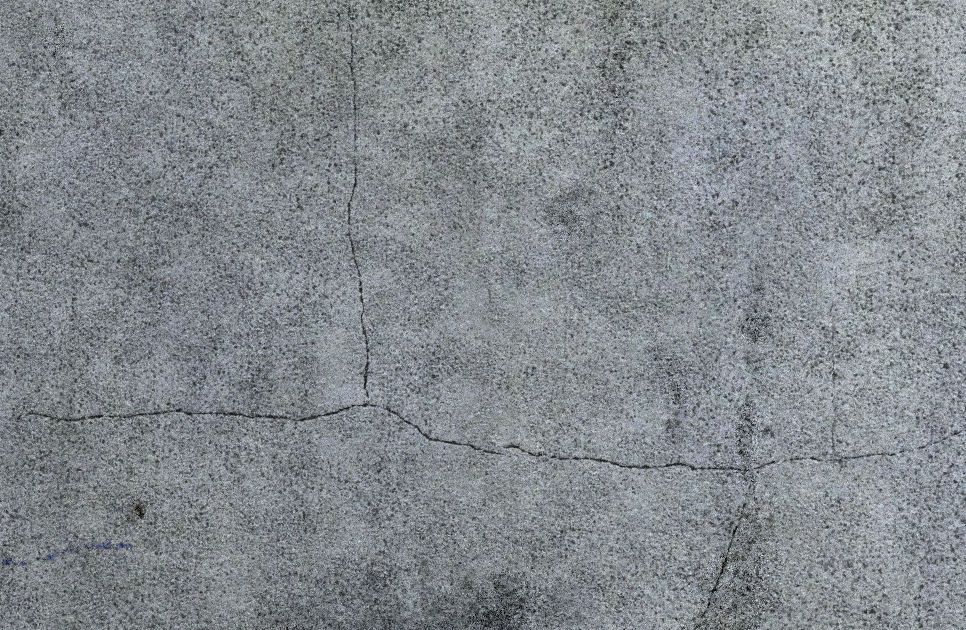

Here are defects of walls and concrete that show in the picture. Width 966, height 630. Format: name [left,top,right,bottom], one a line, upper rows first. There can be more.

crack [19,0,961,471]
crack [693,481,756,630]